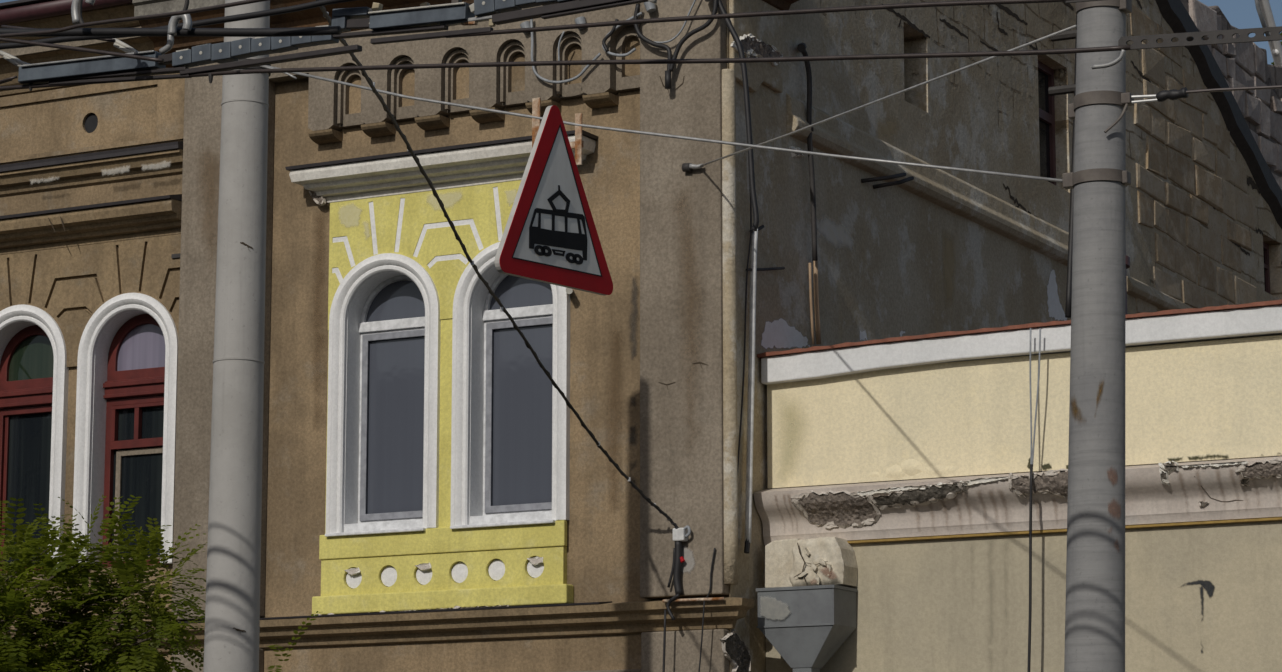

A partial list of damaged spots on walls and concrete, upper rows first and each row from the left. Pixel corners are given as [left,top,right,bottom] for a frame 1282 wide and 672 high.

spalling [1158,457,1282,487]
spalling [760,468,1068,620]
peeling [720,629,752,672]